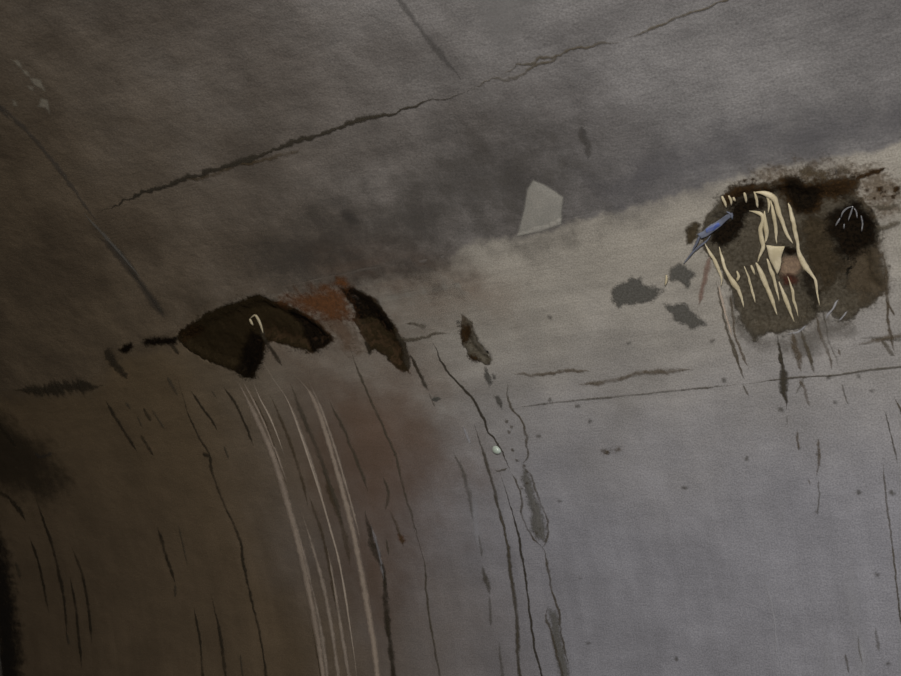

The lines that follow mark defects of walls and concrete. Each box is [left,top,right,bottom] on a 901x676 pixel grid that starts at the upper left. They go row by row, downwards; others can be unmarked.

crack [516,0,728,70]
crack [97,78,495,213]
spalling [685,176,890,342]
spalling [177,295,334,379]
spalling [340,287,410,372]
spalling [457,316,495,384]
leakage [225,385,396,676]
crack [433,344,543,676]